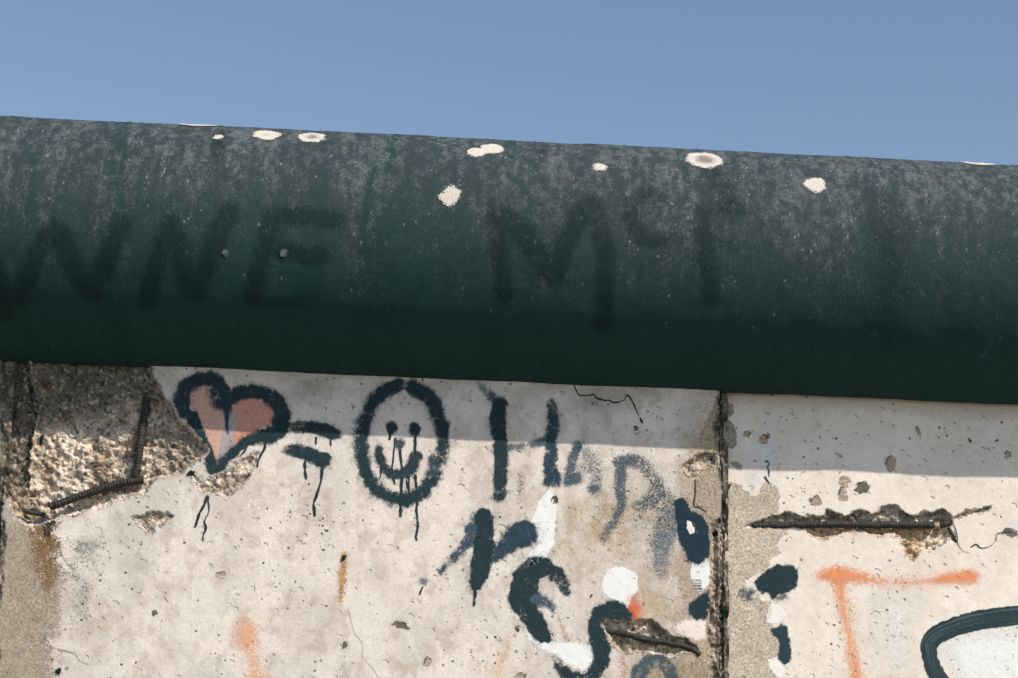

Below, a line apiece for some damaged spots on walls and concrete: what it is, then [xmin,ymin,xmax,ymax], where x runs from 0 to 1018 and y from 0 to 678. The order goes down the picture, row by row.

spalling [0,361,260,606]
peeling [600,393,992,678]